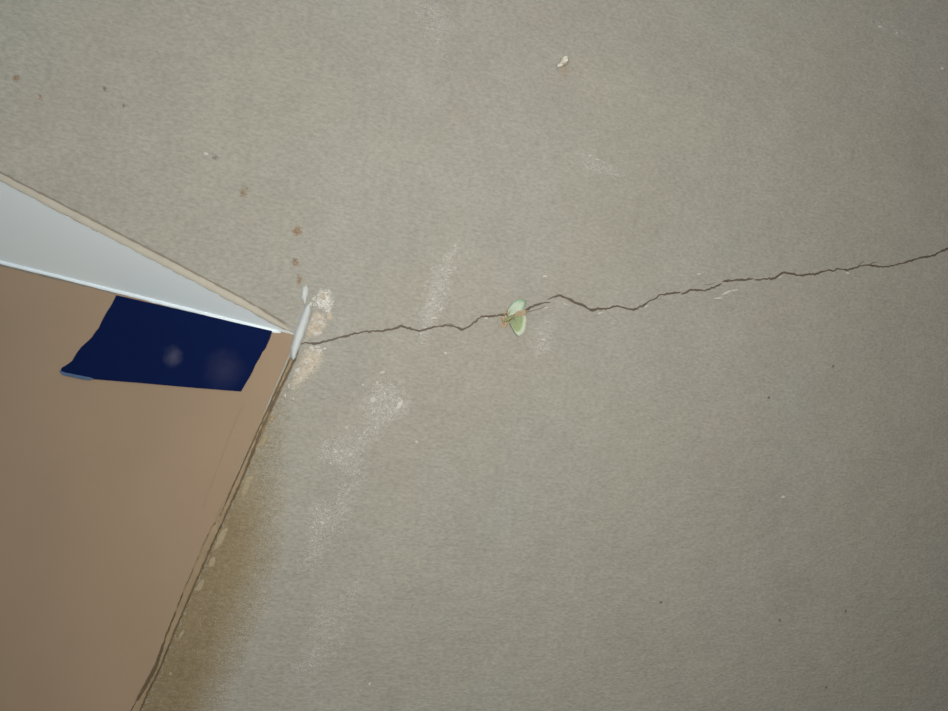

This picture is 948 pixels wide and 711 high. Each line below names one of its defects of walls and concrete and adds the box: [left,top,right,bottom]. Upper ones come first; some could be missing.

crack [131,247,948,711]